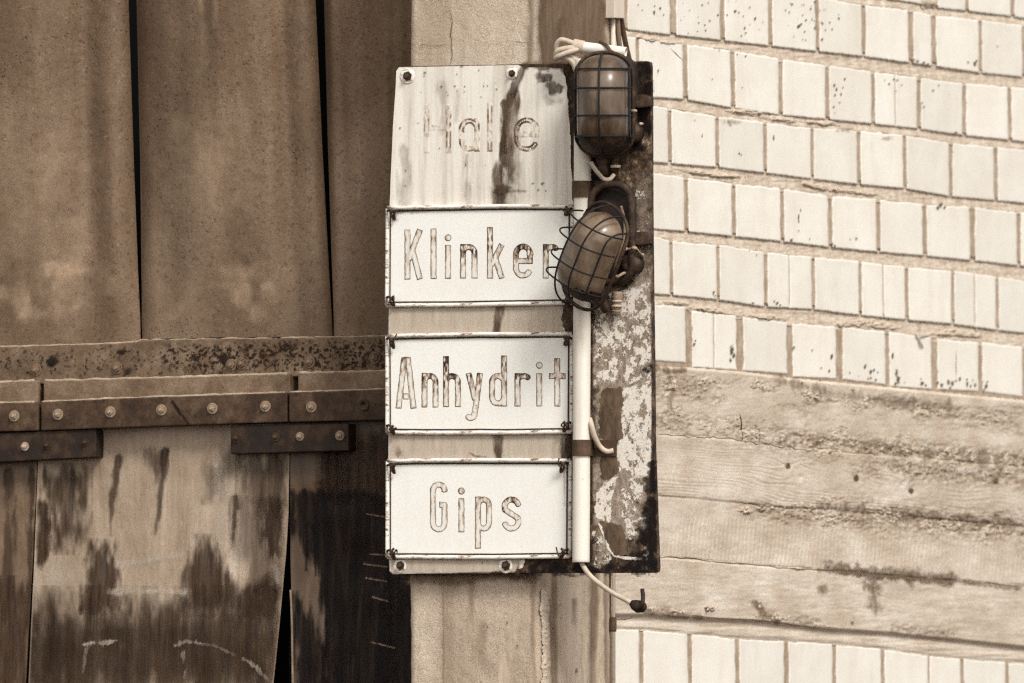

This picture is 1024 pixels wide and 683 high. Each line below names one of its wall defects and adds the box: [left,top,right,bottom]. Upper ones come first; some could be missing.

rust [483,62,571,204]
rust [1,305,571,375]
peeling [592,270,685,568]
leakage [818,561,1020,611]